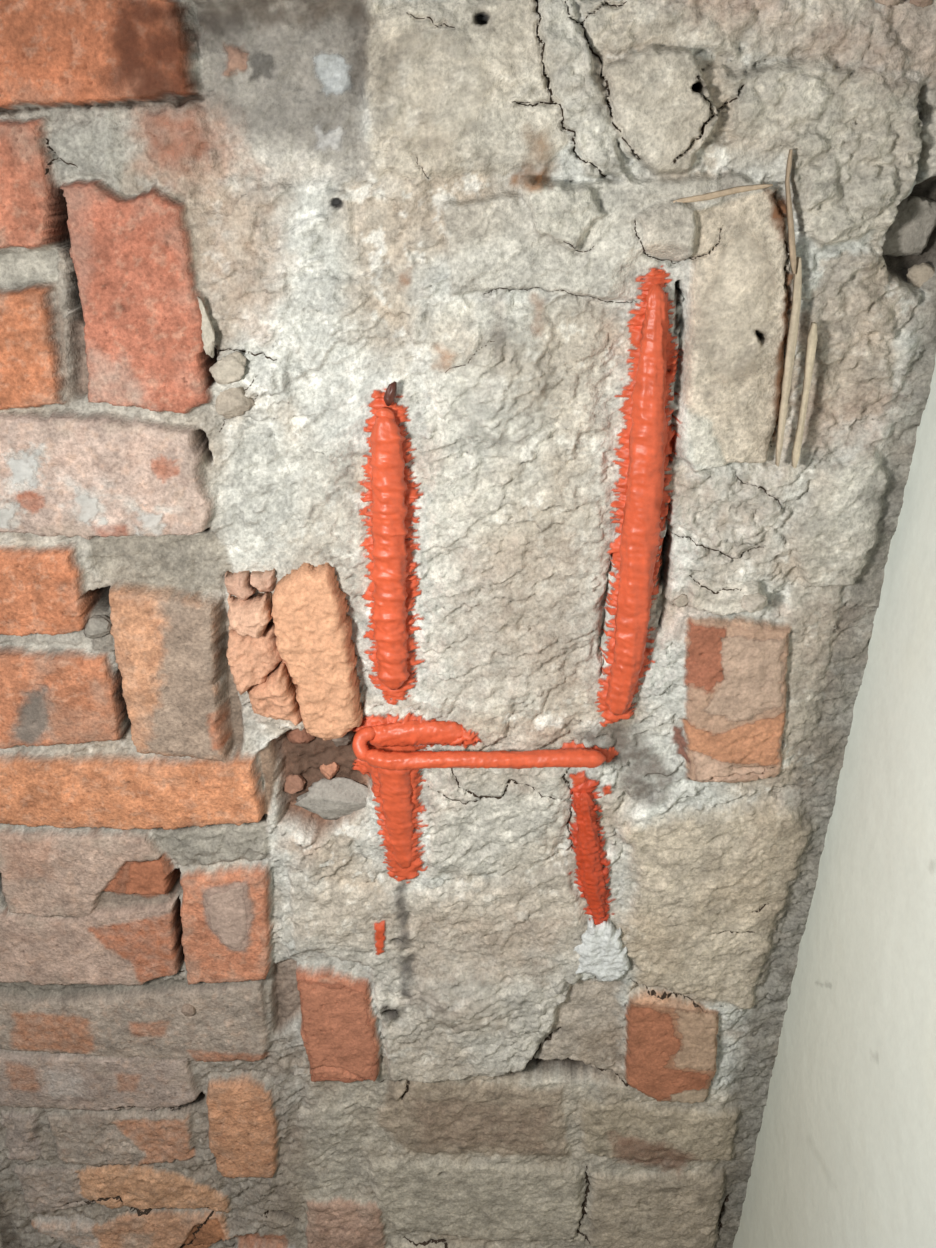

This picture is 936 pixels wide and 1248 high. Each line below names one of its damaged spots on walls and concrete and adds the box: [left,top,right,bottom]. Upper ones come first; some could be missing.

spalling [224,46,273,79]
spalling [314,54,351,95]
crack [513,0,640,177]
spalling [315,126,343,150]
crack [674,76,744,163]
spalling [114,854,181,897]
spalling [203,882,253,951]
crack [534,1027,561,1056]
crack [573,1166,590,1244]